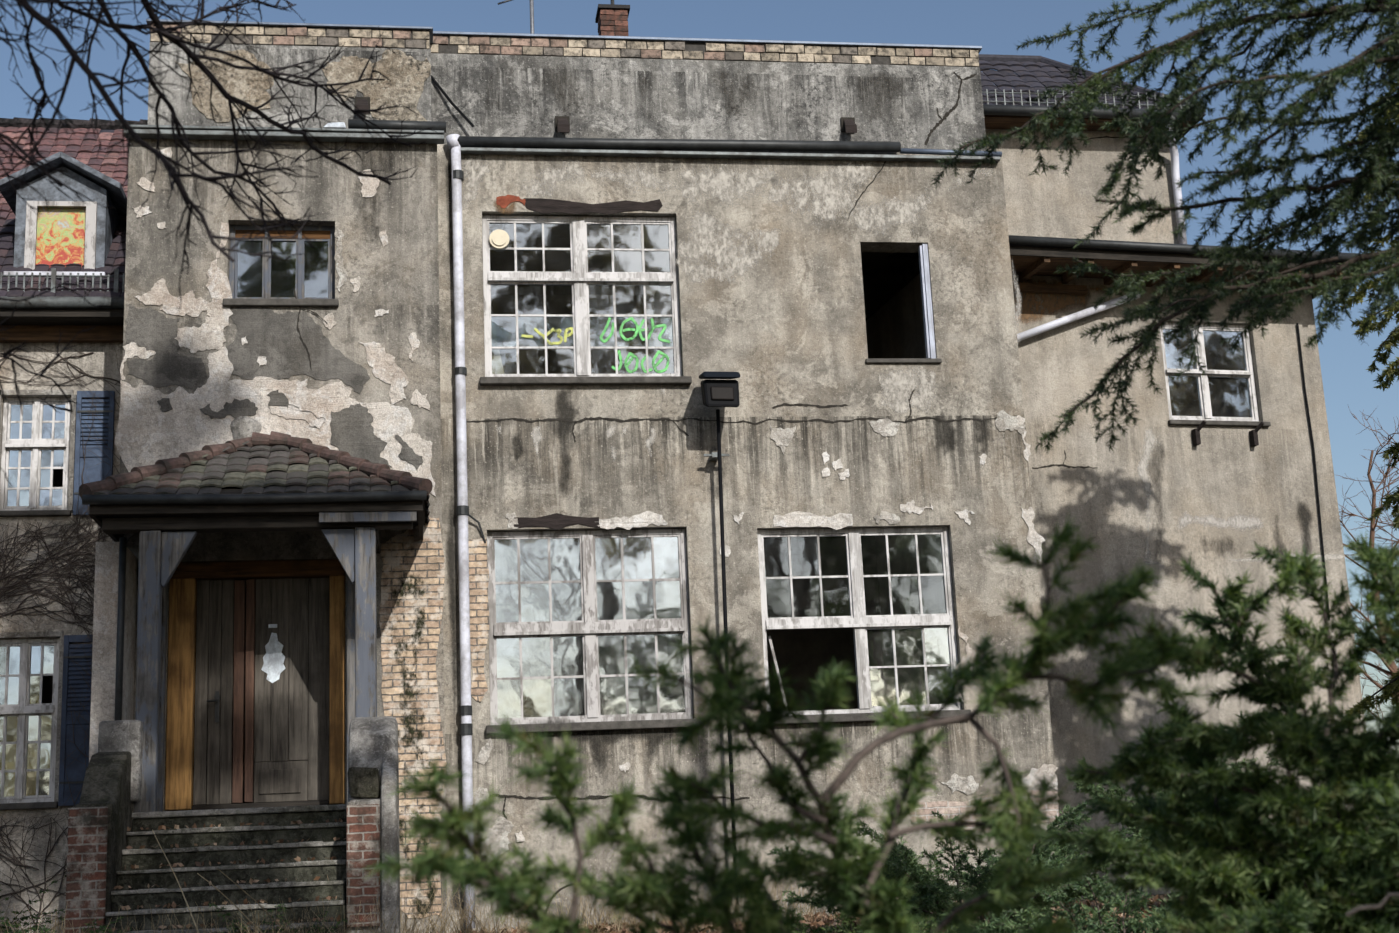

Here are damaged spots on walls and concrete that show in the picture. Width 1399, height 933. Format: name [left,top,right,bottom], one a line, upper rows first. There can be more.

flaking render [175,48,274,123]
flaking render [322,49,431,121]
crack [924,72,977,145]
peeling [358,169,380,198]
rust [495,195,526,213]
peeling [114,223,436,497]
leakage [514,428,541,459]
leakage [542,390,575,491]
crack [466,389,1026,455]
leakage [939,415,955,450]
leakage [976,418,989,453]
crack [1032,450,1096,469]